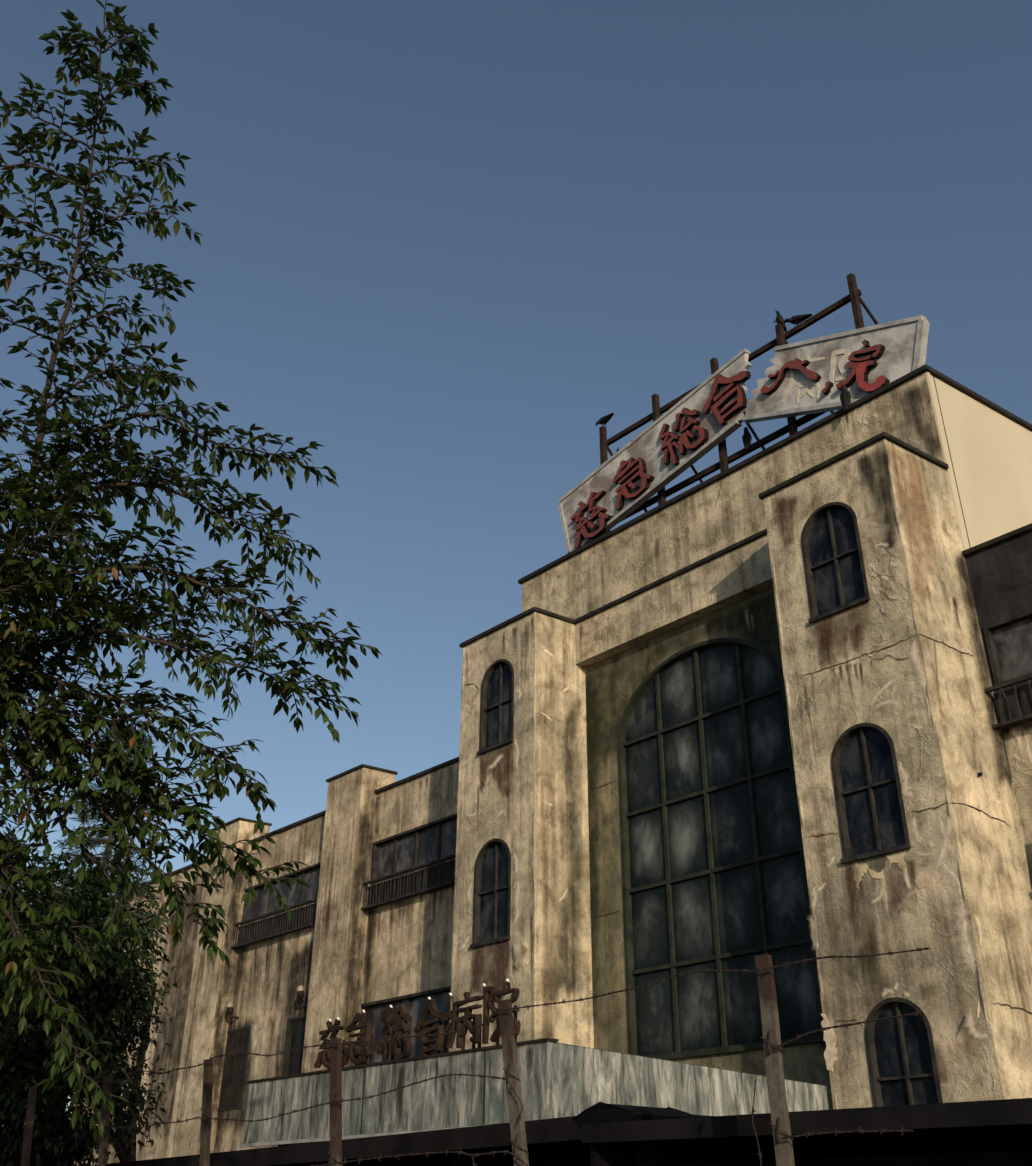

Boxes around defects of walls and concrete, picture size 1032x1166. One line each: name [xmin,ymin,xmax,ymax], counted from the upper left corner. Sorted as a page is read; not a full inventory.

damp [859,452,894,547]
crack [803,545,973,676]
corrosion [822,612,872,683]
corrosion [481,747,511,793]
spalling [811,883,826,949]
peeling [854,816,982,974]
damp [242,942,312,1021]
corrosion [472,940,509,993]
spalling [821,1014,837,1071]